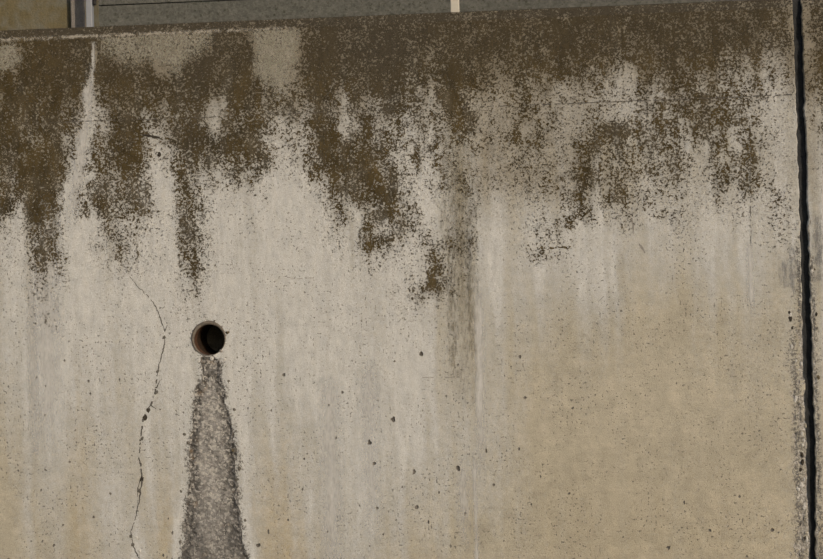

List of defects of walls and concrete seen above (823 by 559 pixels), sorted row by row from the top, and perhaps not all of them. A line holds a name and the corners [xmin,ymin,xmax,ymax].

leakage [0,42,159,421]
leakage [172,181,211,320]
leakage [313,155,479,322]
leakage [533,203,568,265]
leakage [580,179,649,234]
crack [129,277,167,558]